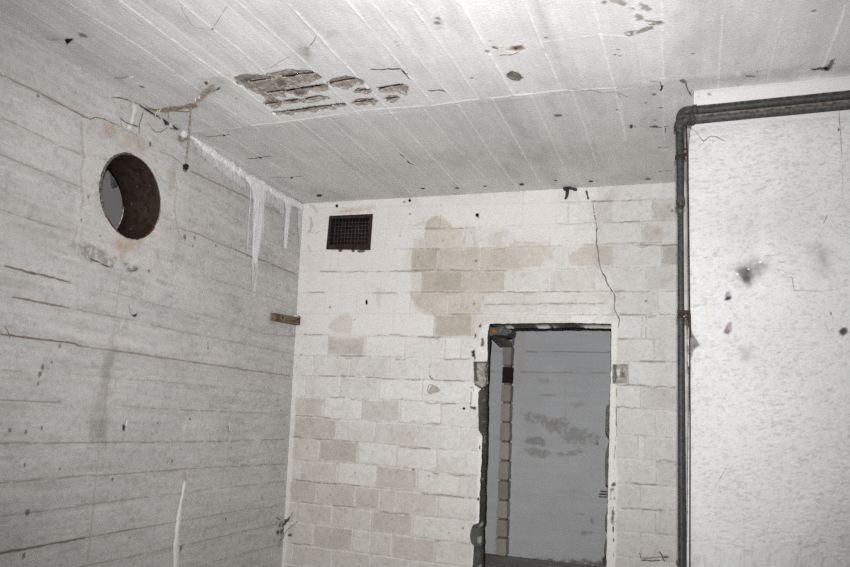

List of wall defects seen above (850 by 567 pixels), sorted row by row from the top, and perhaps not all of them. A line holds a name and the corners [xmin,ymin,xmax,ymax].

spalling [233,68,410,116]
leakage [190,136,320,294]
leakage [408,215,555,339]
leakage [568,242,614,268]
leakage [586,188,618,223]
crack [585,190,620,328]